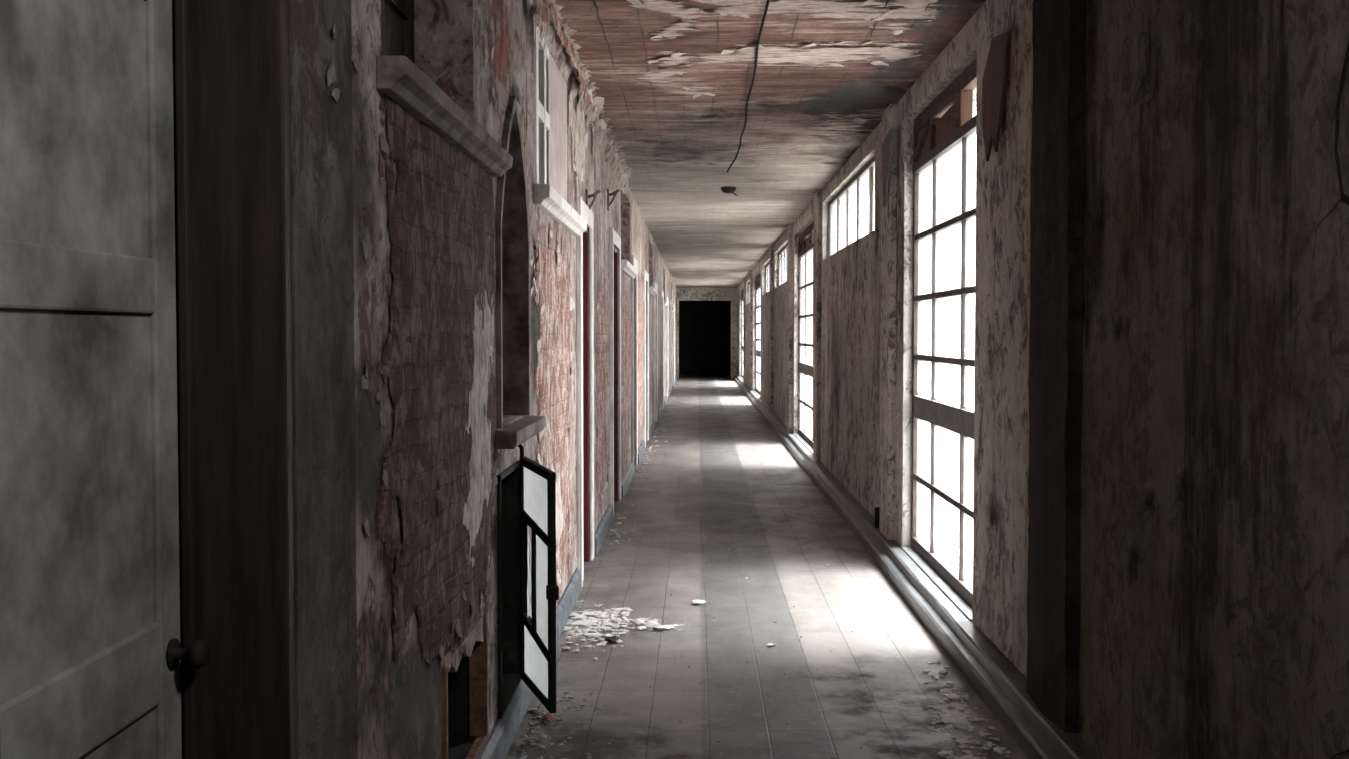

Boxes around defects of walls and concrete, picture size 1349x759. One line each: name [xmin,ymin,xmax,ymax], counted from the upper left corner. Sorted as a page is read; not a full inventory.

peeling [627,0,946,100]
spalling [327,58,499,669]
spalling [530,219,575,585]